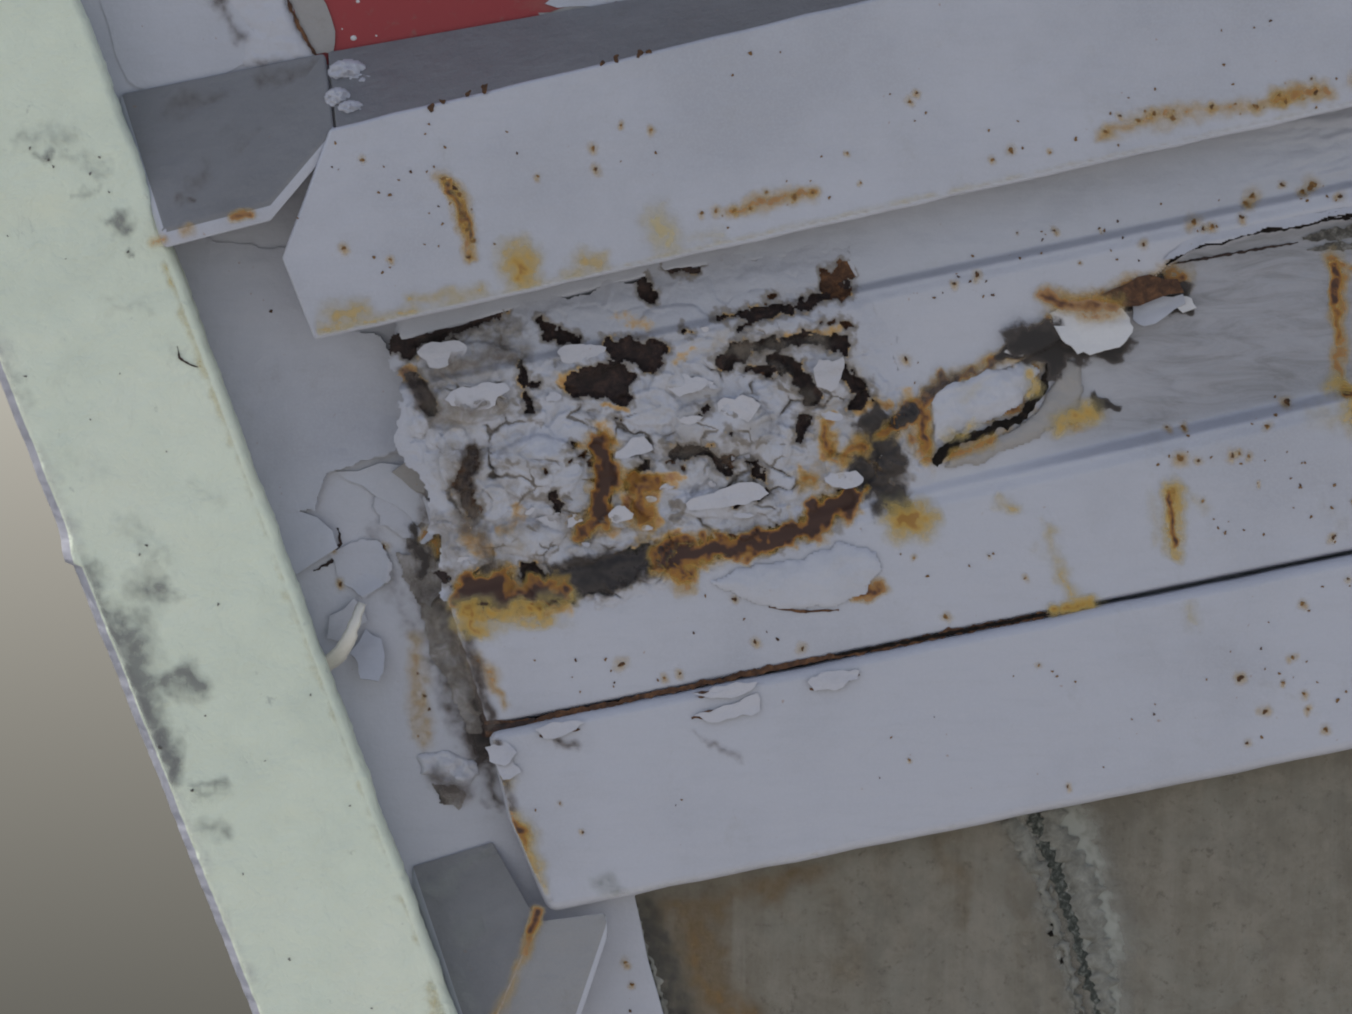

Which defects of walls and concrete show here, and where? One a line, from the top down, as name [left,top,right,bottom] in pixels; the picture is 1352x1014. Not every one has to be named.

corrosion [377,165,476,260]
corrosion [457,444,479,505]
spalling [173,238,934,628]
corrosion [572,430,869,598]
corrosion [886,501,940,559]
corrosion [820,345,1040,466]
corrosion [1162,483,1184,560]
peeling [327,598,385,682]
peeling [535,720,585,747]
peeling [691,681,760,723]
peeling [808,670,860,691]
crack [1001,804,1126,1014]